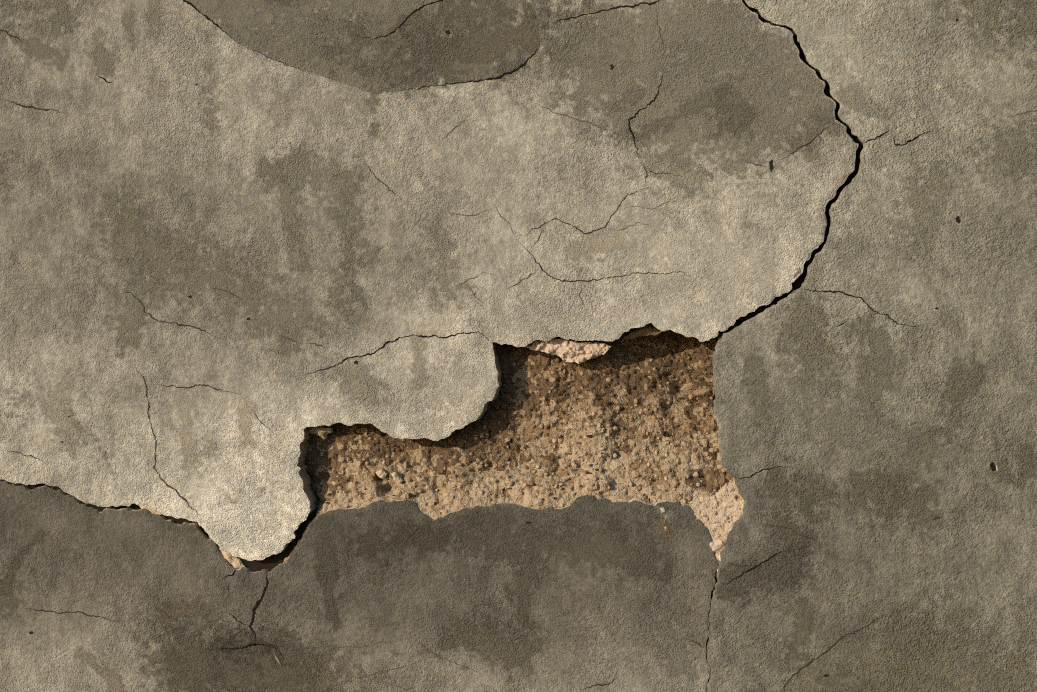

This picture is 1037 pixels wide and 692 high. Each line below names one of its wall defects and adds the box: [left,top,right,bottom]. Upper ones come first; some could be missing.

crack [359,0,442,39]
crack [395,0,689,308]
spalling [744,0,864,150]
crack [742,0,939,327]
crack [11,371,481,692]
flaking render [0,316,753,666]
crack [278,331,487,375]
crack [688,525,816,691]